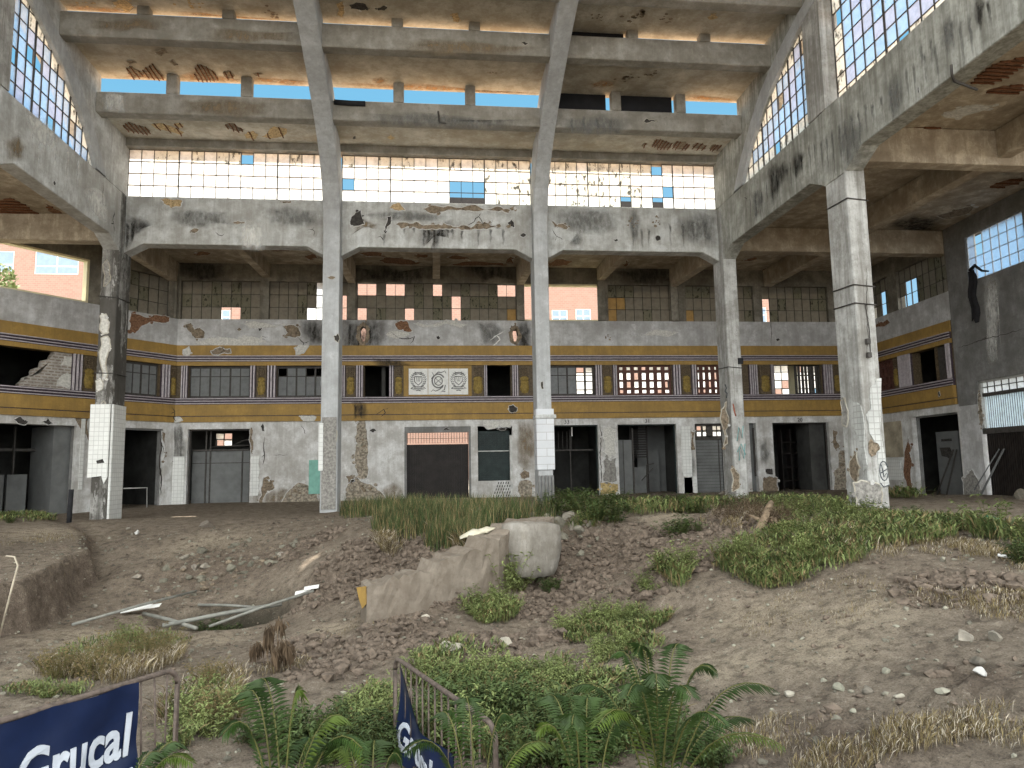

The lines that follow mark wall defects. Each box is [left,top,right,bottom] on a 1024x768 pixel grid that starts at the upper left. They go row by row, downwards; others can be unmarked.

spalling [126,48,178,81]
spalling [194,65,235,83]
spalling [914,56,1024,129]
spalling [642,139,722,152]
water stain [750,114,860,215]
flaking render [384,202,527,238]
flaking render [128,312,170,334]
flaking render [95,313,111,404]
flaking render [257,476,320,503]
flaking render [341,421,386,501]
flaking render [831,397,883,508]
flaking render [903,438,914,490]